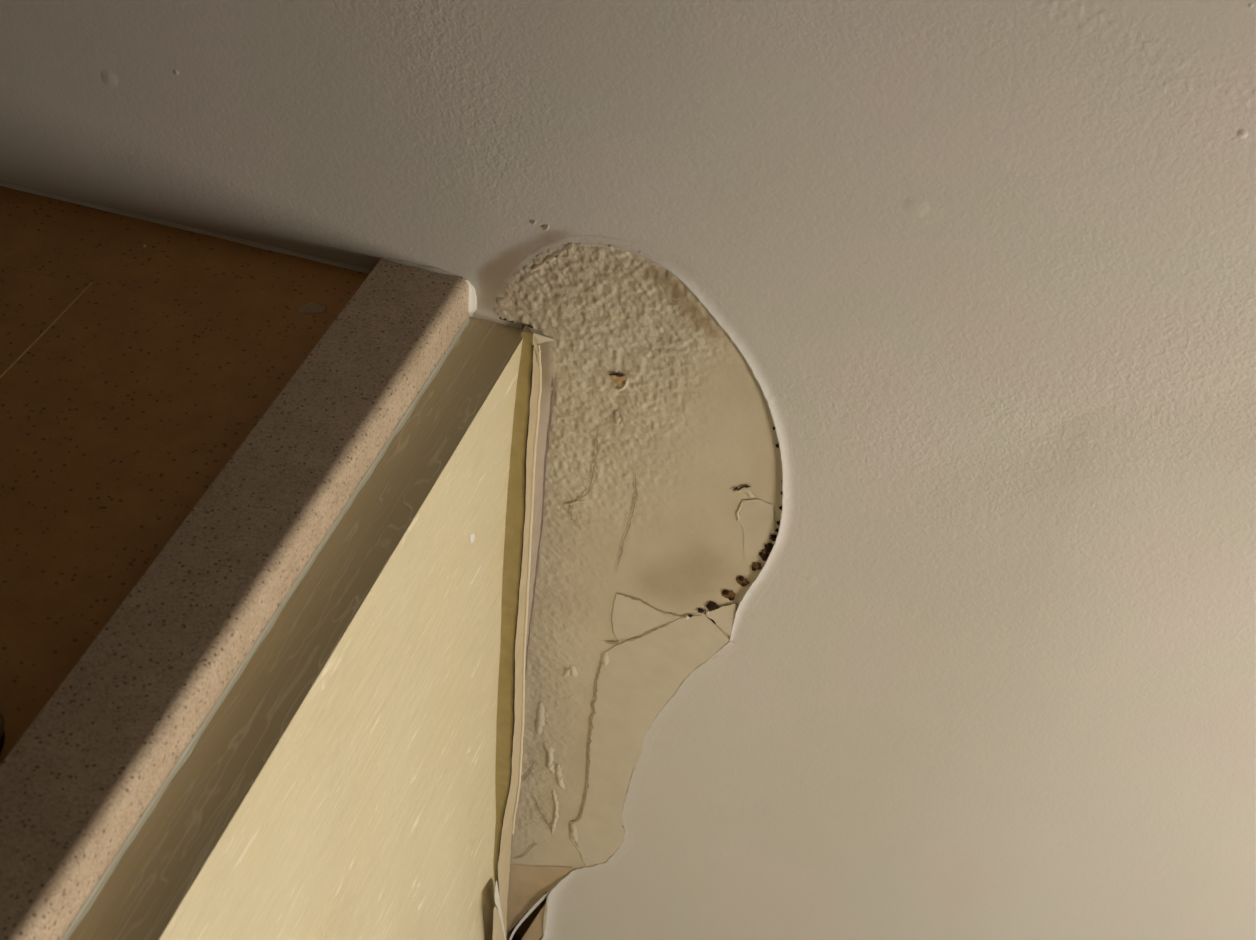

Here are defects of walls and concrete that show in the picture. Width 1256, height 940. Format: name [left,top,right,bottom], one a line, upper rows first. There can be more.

peeling [493,220,800,940]